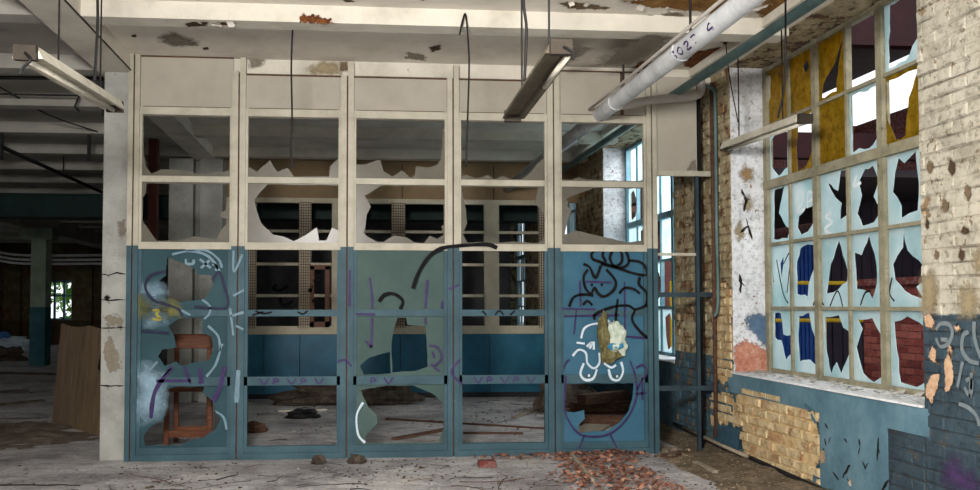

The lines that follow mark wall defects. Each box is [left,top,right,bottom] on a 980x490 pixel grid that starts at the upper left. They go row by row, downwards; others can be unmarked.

peeling [560,1,609,10]
peeling [622,0,727,16]
peeling [752,0,784,18]
spalling [299,13,333,25]
flaking render [705,283,955,485]